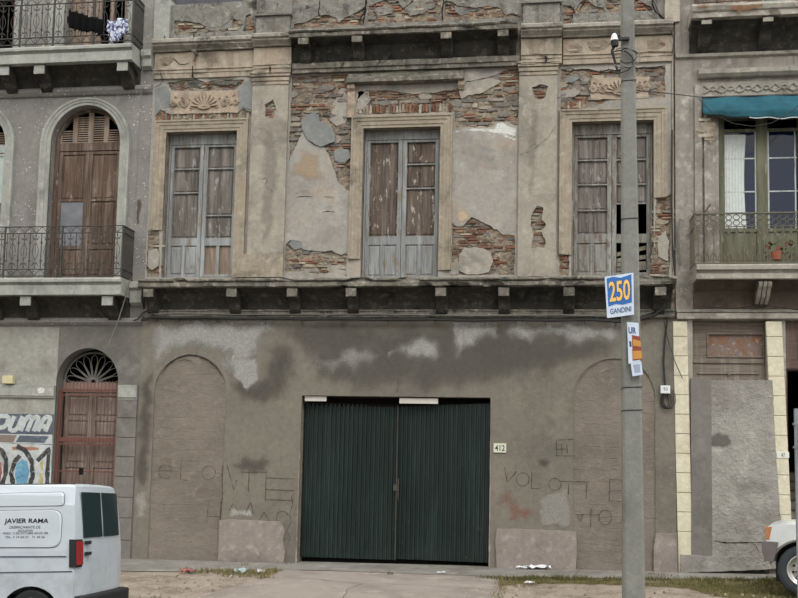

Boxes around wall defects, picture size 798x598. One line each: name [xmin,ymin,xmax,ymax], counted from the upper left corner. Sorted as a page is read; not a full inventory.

spalling [294,0,520,29]
spalling [169,79,244,91]
spalling [532,85,548,100]
spalling [557,69,621,109]
spalling [635,66,666,99]
spalling [289,69,519,191]
spalling [285,240,347,276]
spalling [446,218,515,275]
spalling [531,206,546,248]
spalling [649,193,675,276]
water stain [152,319,288,400]
water stain [301,321,616,385]